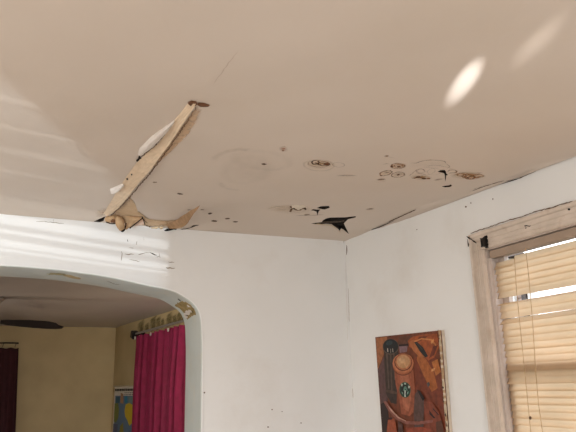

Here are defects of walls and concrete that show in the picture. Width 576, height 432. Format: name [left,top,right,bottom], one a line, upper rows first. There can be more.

peeling [138,121,174,157]
peeling [115,199,175,229]
peeling [175,301,196,320]